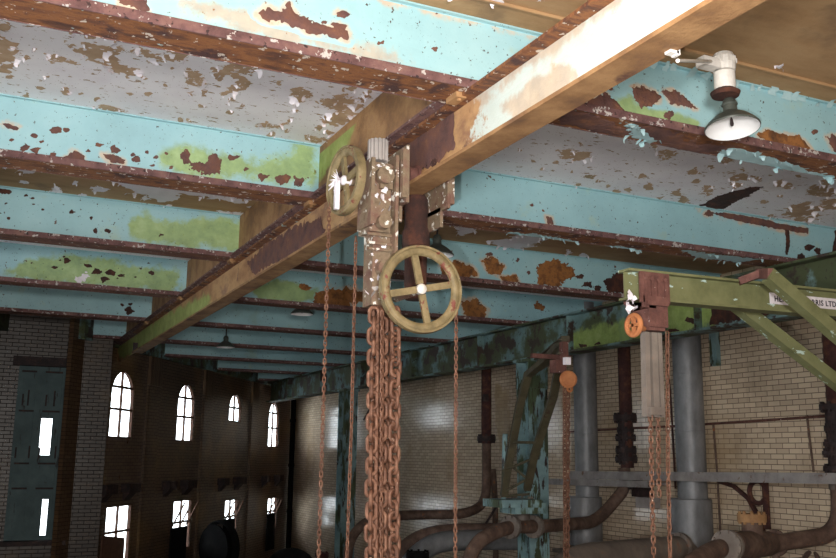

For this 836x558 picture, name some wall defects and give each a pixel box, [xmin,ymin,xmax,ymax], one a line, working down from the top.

corrosion [104,0,537,68]
peeling [0,22,263,115]
peeling [72,181,251,215]
damp [120,205,240,252]
damp [145,121,359,192]
peeling [255,87,377,144]
corrosion [558,79,728,154]
peeling [619,123,678,161]
peeling [686,148,836,225]
corrosion [750,122,836,154]
damp [0,249,213,362]
corrosion [449,251,623,293]